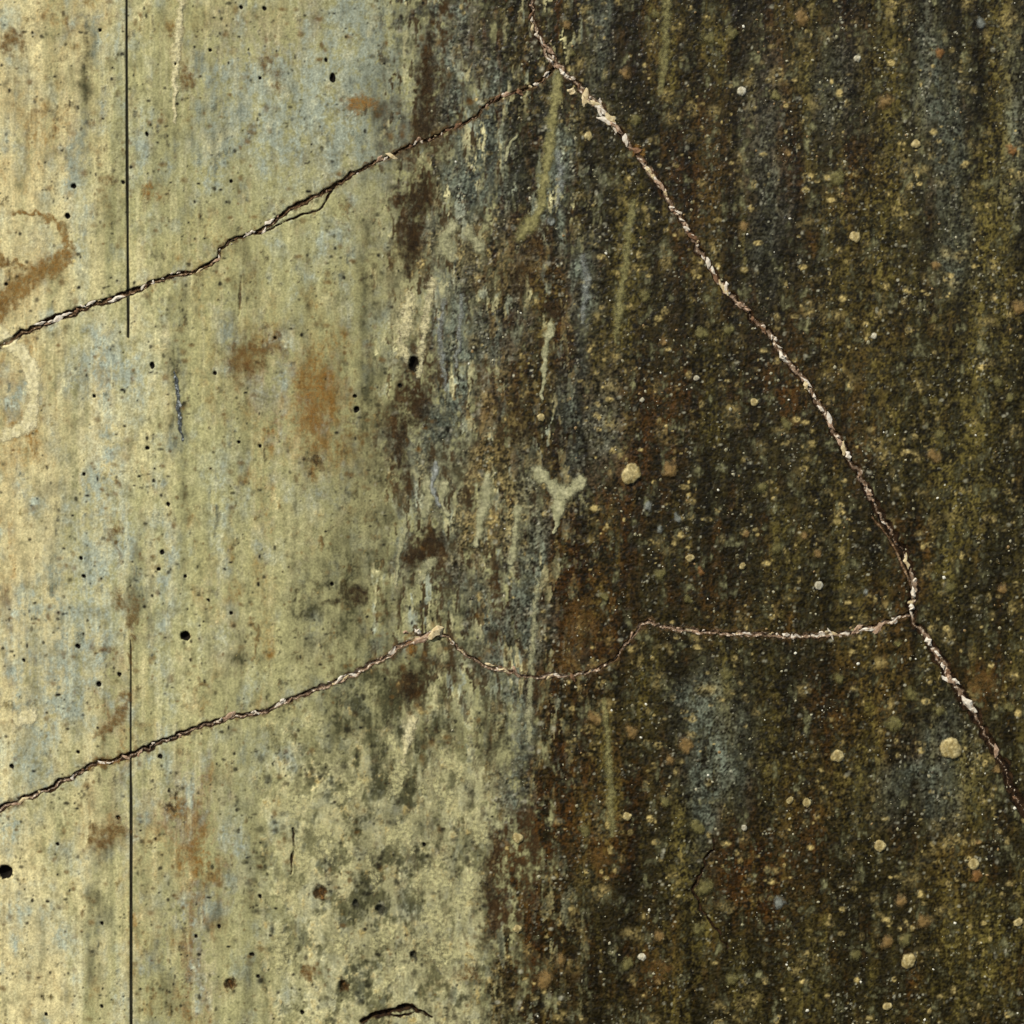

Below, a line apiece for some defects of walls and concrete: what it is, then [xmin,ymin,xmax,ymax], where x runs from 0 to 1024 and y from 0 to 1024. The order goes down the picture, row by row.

water stain [409,11,439,141]
water stain [658,0,670,92]
water stain [391,179,431,276]
water stain [511,72,562,294]
water stain [613,200,635,342]
crack [0,0,1024,818]
water stain [539,299,565,400]
water stain [395,522,448,585]
water stain [524,581,539,742]
crack [0,625,568,1024]
water stain [400,716,418,766]
water stain [602,699,615,837]